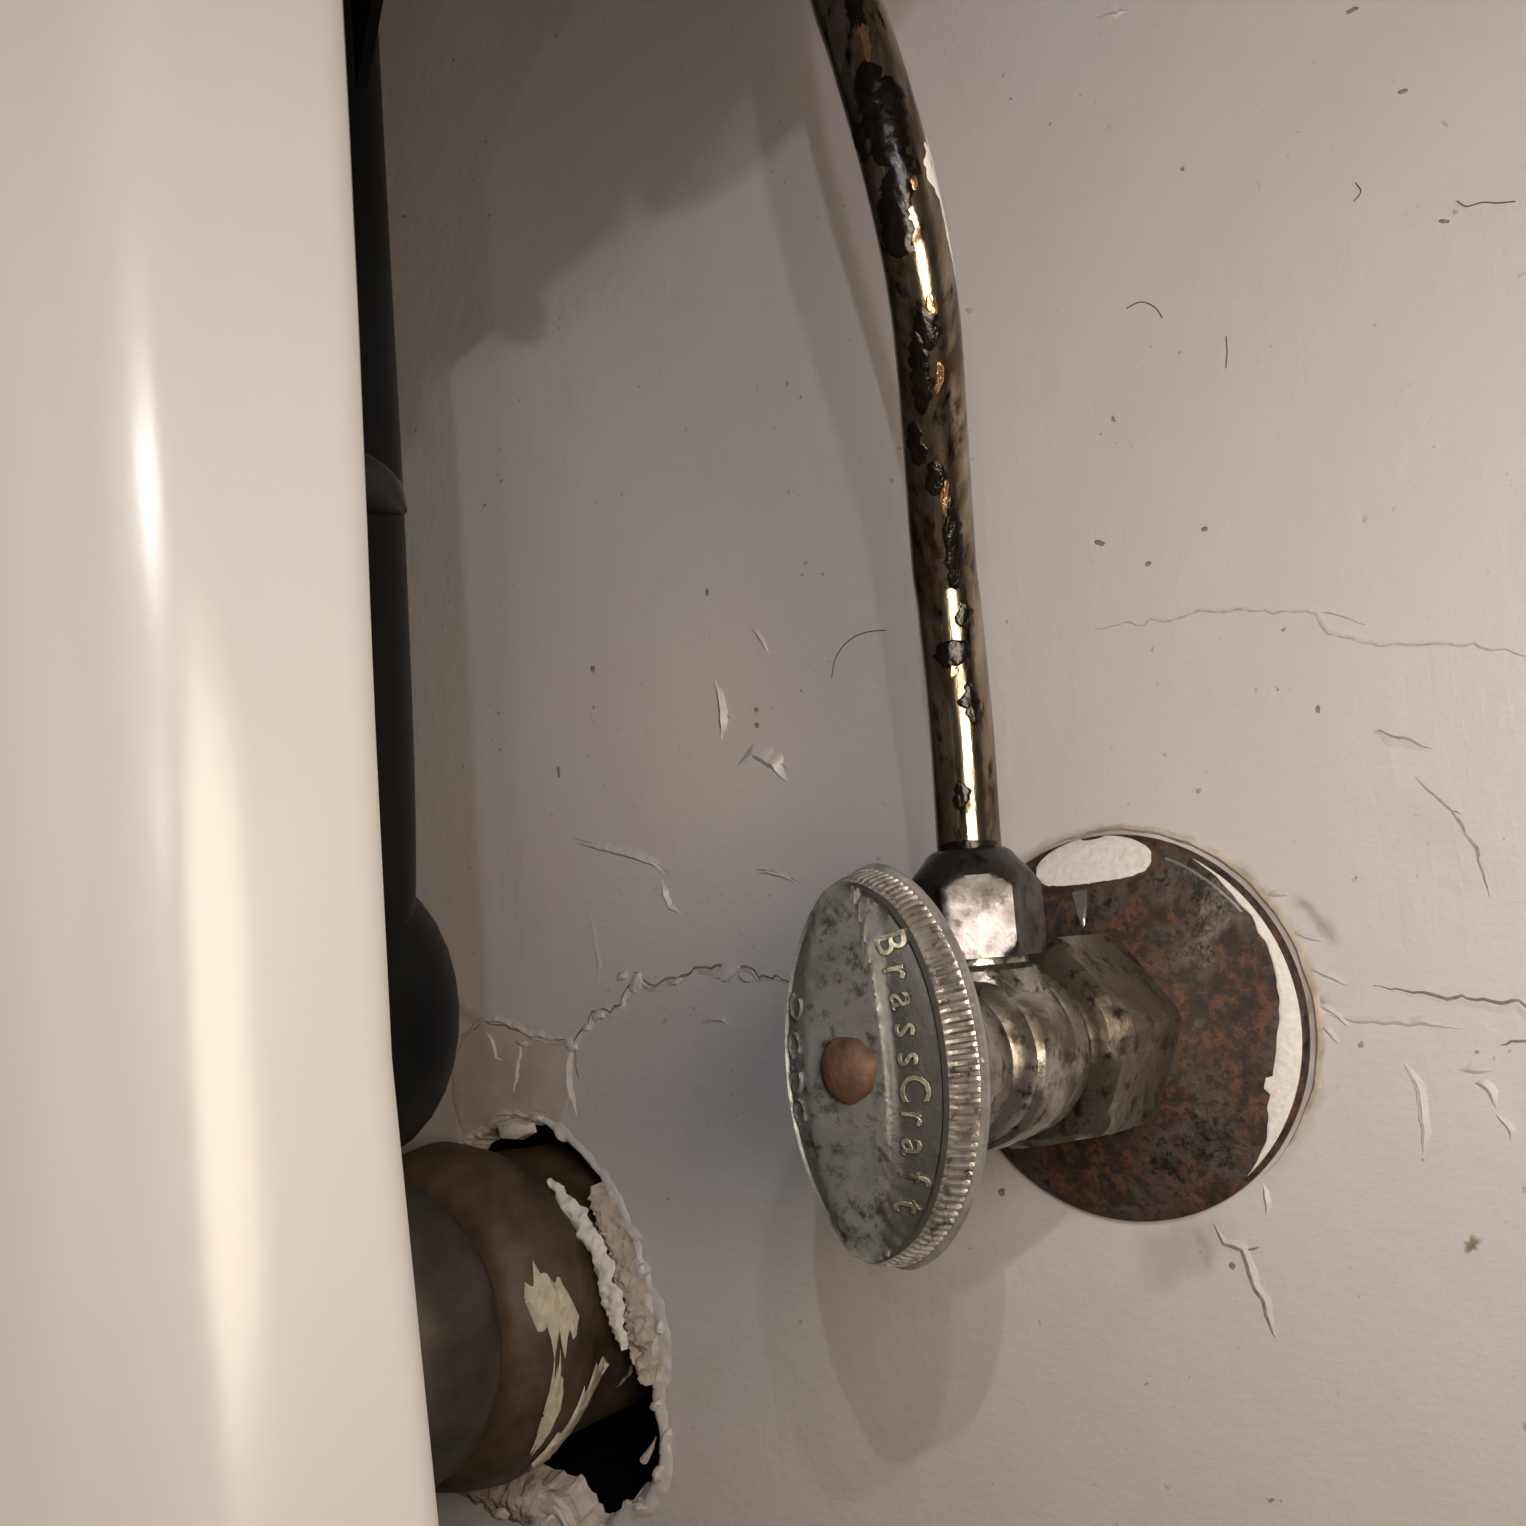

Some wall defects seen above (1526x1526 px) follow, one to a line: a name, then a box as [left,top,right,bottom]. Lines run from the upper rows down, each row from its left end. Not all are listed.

rust [844,0,867,29]
rust [850,60,922,259]
rust [905,306,975,668]
rust [957,682,981,726]
crack [1095,600,1526,657]
rust [952,781,972,811]
rust [938,840,998,850]
crack [1374,730,1490,898]
crack [510,916,789,1079]
crack [1323,985,1526,1156]
flaking render [452,1014,673,1526]
crack [1213,1223,1277,1338]